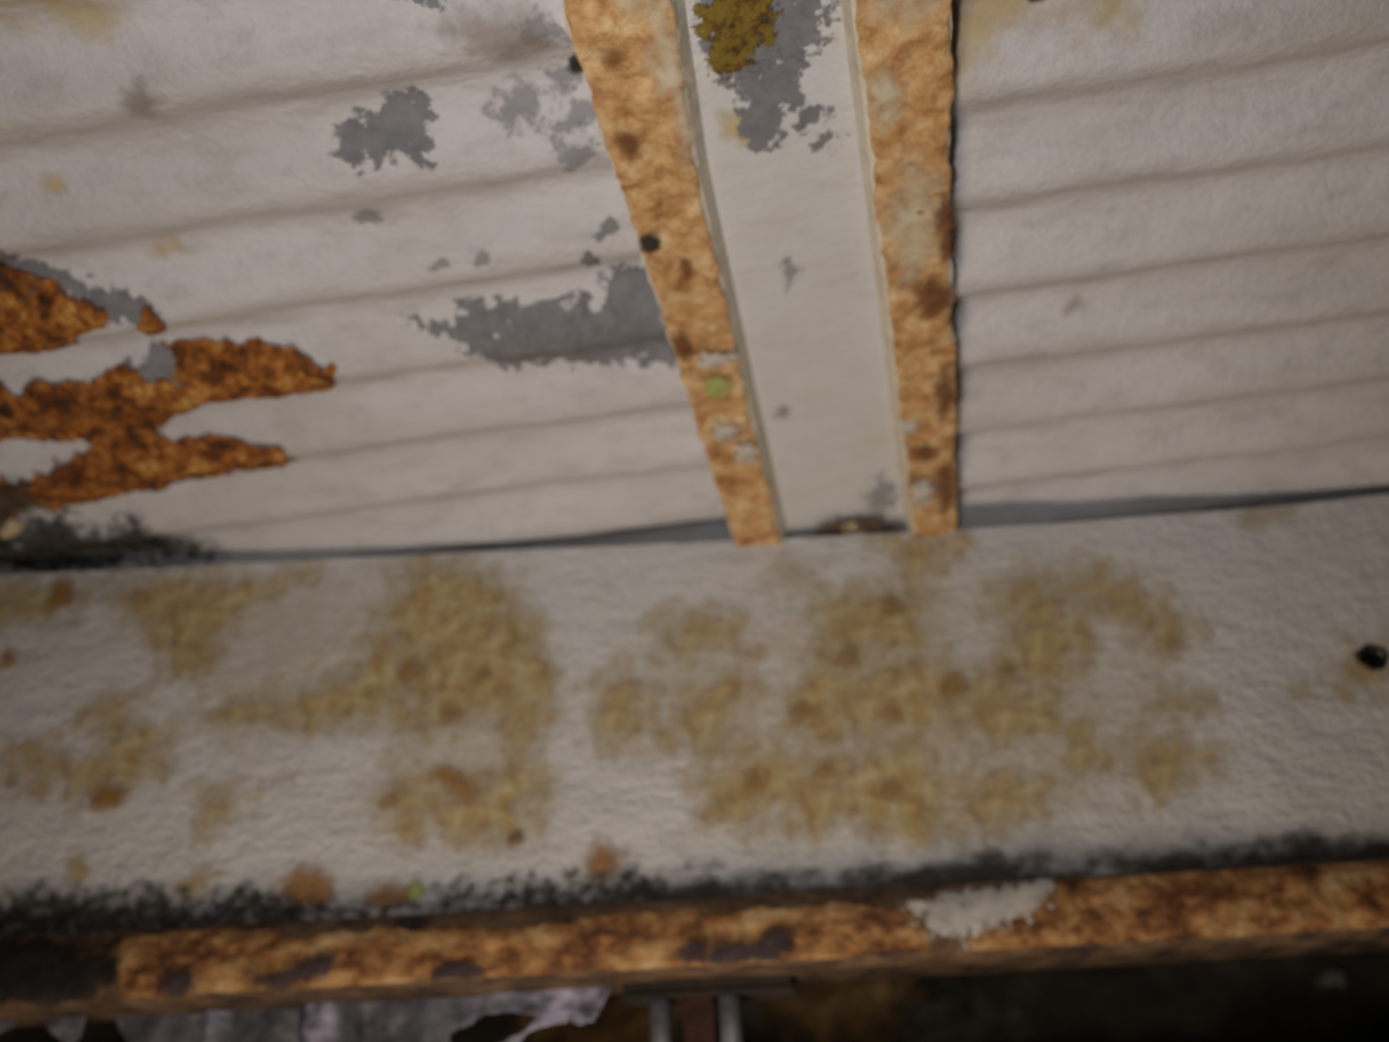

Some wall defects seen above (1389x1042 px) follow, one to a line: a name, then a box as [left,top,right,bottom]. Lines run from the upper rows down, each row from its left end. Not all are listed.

peeling [413,0,444,12]
peeling [332,87,439,176]
peeling [485,68,596,172]
peeling [407,216,677,371]
corrosion [565,0,957,547]
corrosion [0,251,338,538]
corrosion [286,868,331,904]
corrosion [79,901,931,998]
leakage [0,853,1096,938]
peeling [907,879,1055,946]
corrosion [967,861,1389,951]
leakage [1113,836,1389,875]